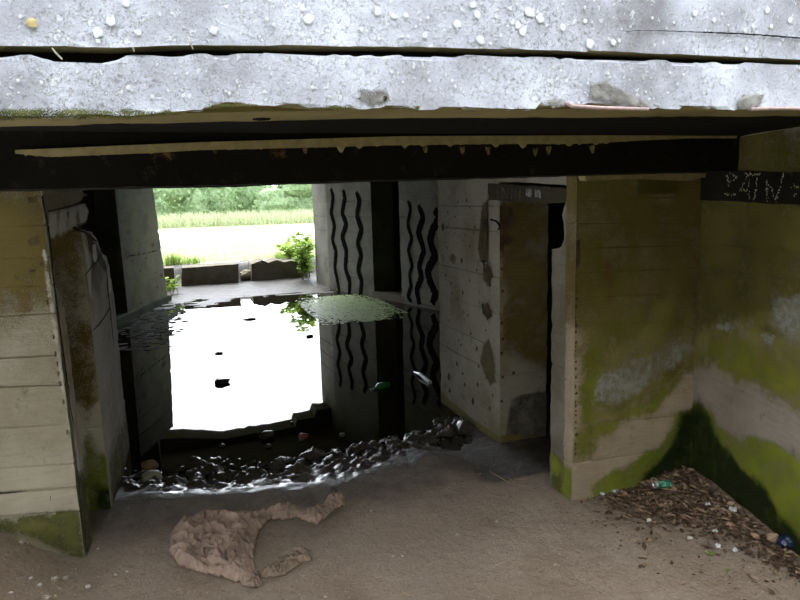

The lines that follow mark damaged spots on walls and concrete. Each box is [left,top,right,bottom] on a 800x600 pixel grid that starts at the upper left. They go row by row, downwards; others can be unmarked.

spalling [358,87,391,104]
spalling [546,80,654,111]
spalling [737,92,800,111]
leakage [565,176,577,330]
leakage [0,191,100,417]
spalling [477,201,519,386]
leakage [0,508,84,558]